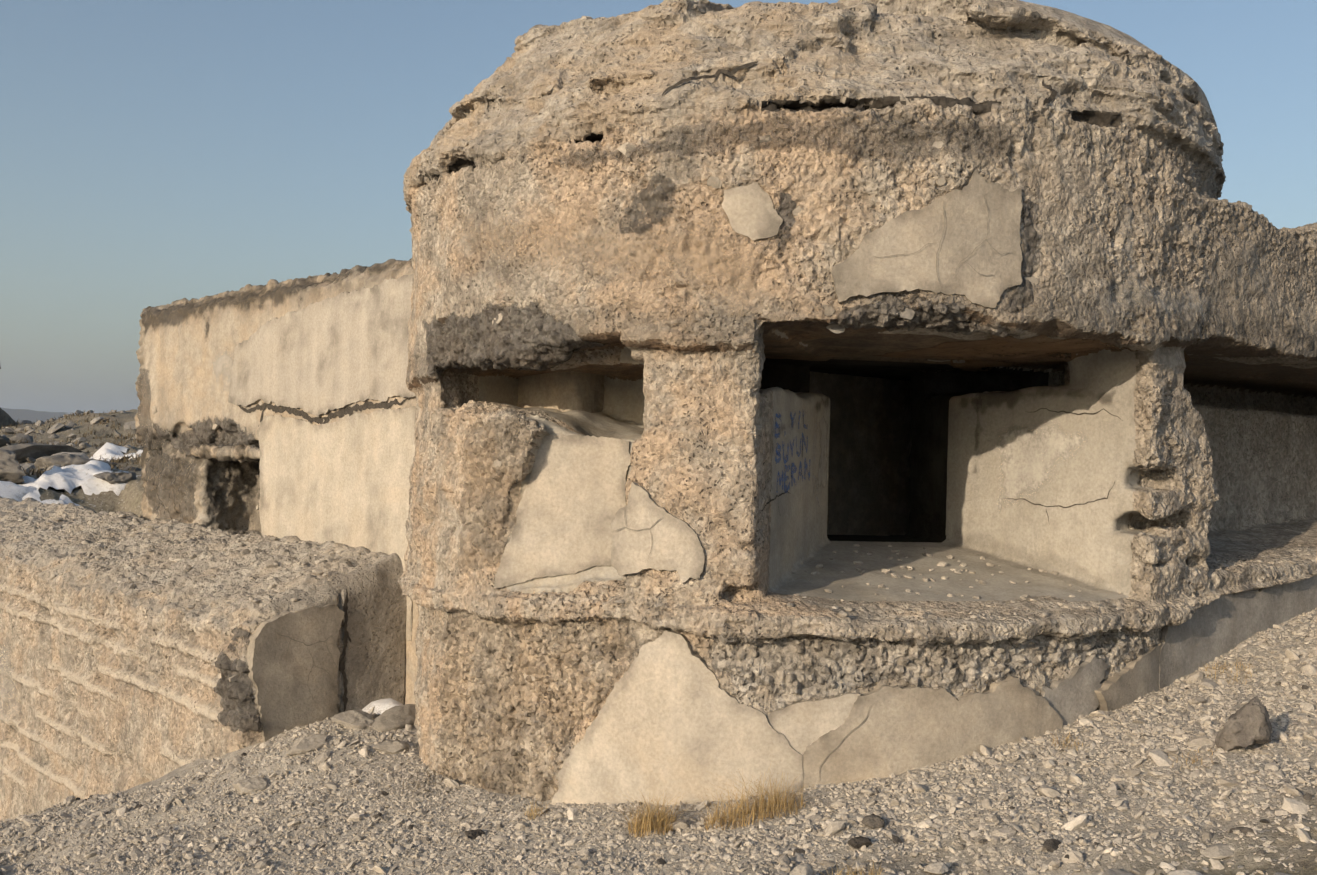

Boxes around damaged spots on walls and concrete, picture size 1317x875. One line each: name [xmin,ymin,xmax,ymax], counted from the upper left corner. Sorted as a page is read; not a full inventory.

crack [662,61,759,96]
crack [761,95,1001,114]
crack [1042,80,1122,127]
crack [576,133,603,143]
crack [425,158,476,185]
crack [239,398,411,425]
flaking render [152,274,608,571]
crack [1030,408,1123,421]
flaking render [458,415,706,588]
crack [1004,482,1115,521]
crack [275,589,351,712]
flaking render [411,576,1317,818]